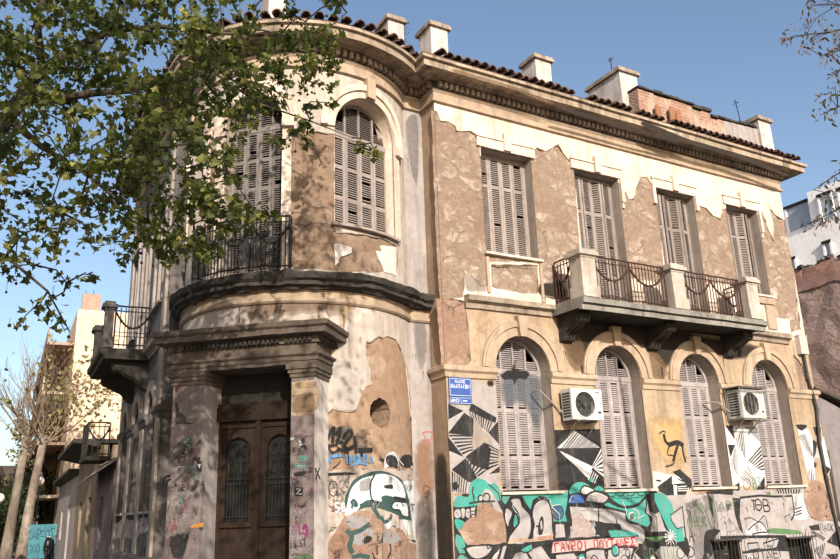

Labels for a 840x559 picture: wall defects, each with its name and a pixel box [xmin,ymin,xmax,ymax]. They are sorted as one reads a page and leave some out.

flaking render [291,131,398,276]
flaking render [431,111,579,366]
flaking render [619,176,663,283]
flaking render [693,199,736,284]
flaking render [760,208,800,333]
flaking render [328,336,413,471]
flaking render [328,510,417,559]